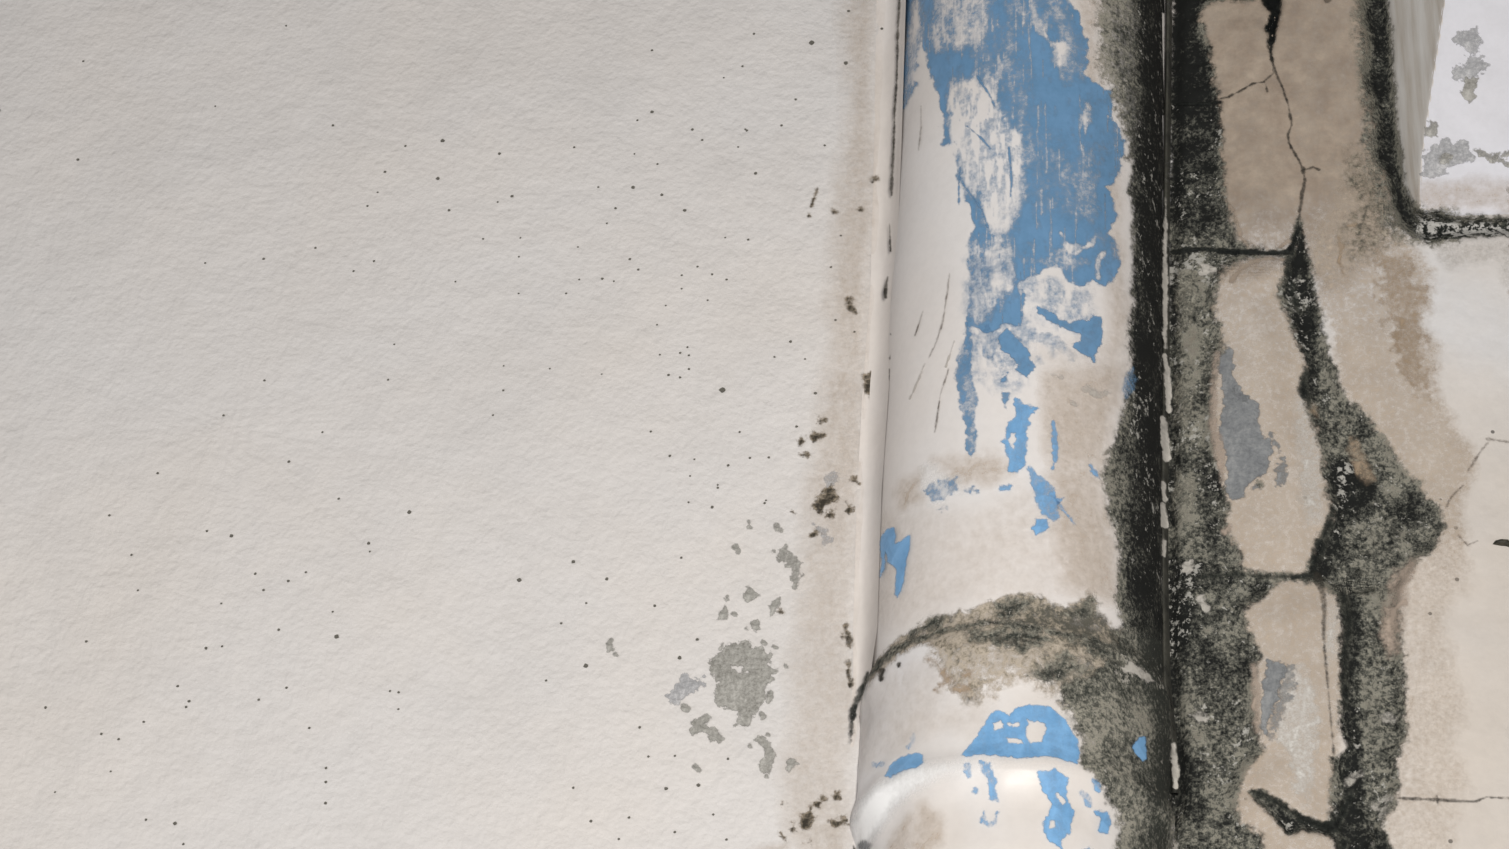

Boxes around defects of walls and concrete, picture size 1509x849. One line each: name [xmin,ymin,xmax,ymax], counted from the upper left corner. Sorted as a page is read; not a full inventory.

crack [1170,0,1320,256]
flaking render [1420,121,1509,178]
flaking render [1452,26,1490,103]
peeling [903,0,1126,535]
water stain [841,0,1509,849]
flaking render [1217,347,1319,517]
flaking render [665,523,804,778]
peeling [877,753,923,777]
peeling [962,704,1111,849]
crack [1402,796,1494,804]